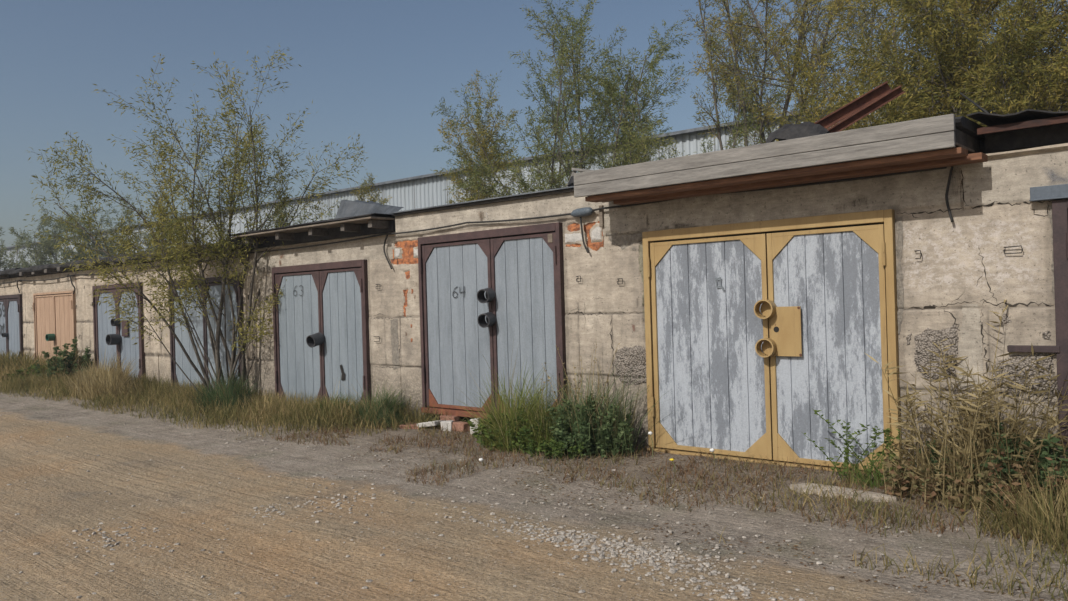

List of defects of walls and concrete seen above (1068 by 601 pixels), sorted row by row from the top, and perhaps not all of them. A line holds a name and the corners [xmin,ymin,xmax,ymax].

crack [897,170,1051,218]
flaking render [391,240,418,342]
flaking render [565,221,645,332]
spalling [896,215,959,382]
spalling [614,345,647,386]
spalling [991,353,1057,394]